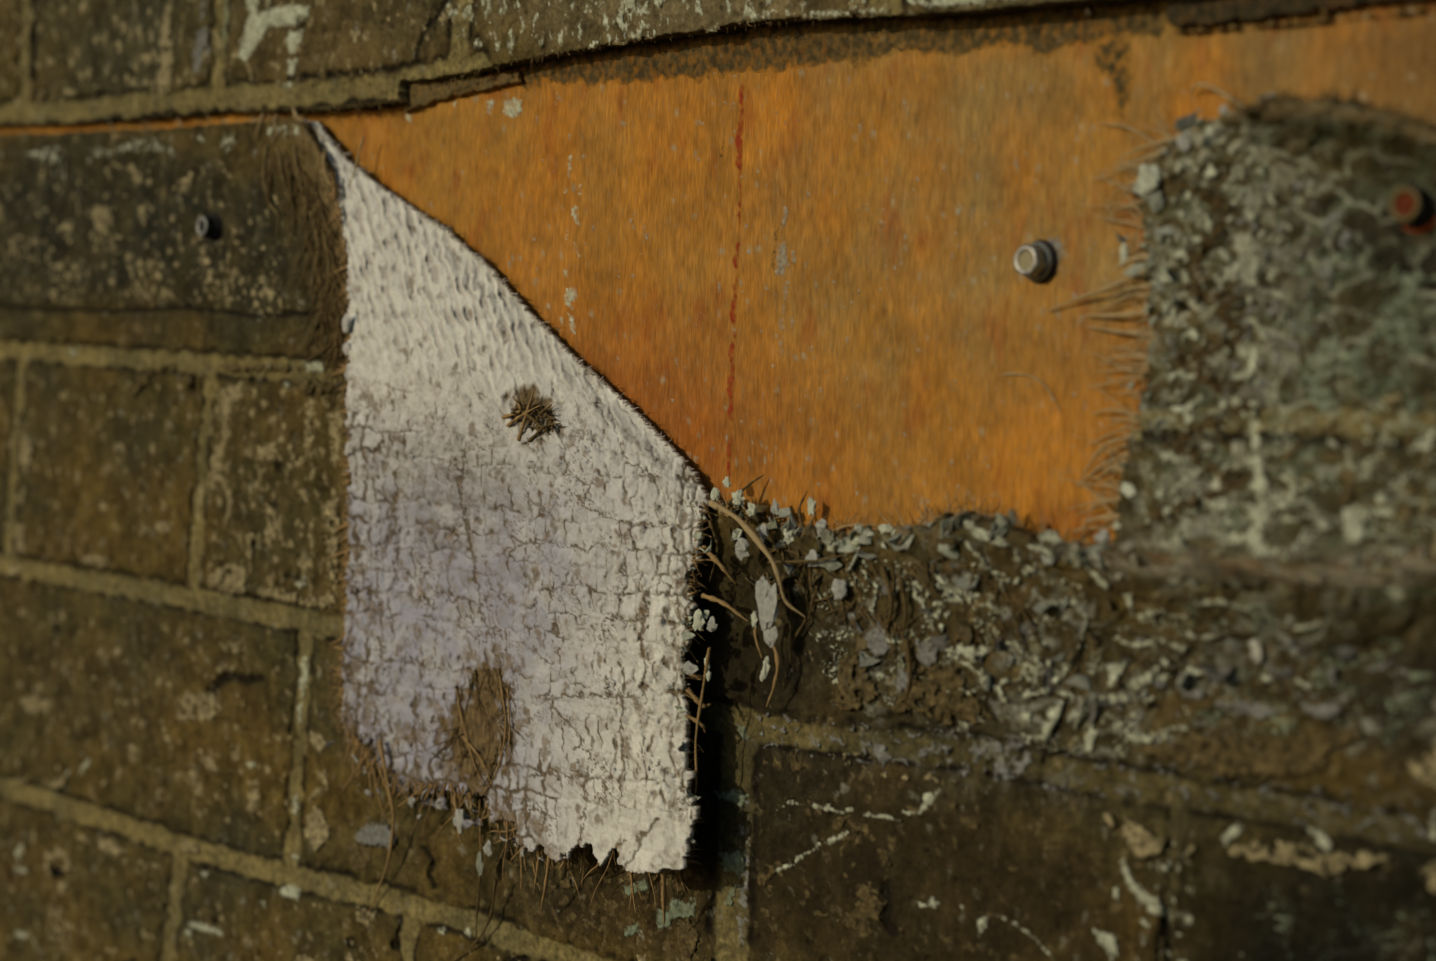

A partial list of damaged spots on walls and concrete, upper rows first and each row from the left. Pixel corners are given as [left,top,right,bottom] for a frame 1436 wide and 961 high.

peeling [485,96,523,119]
peeling [0,0,1018,108]
spalling [685,109,1436,961]
crack [207,673,264,693]
peeling [666,596,696,722]
peeling [365,780,483,829]